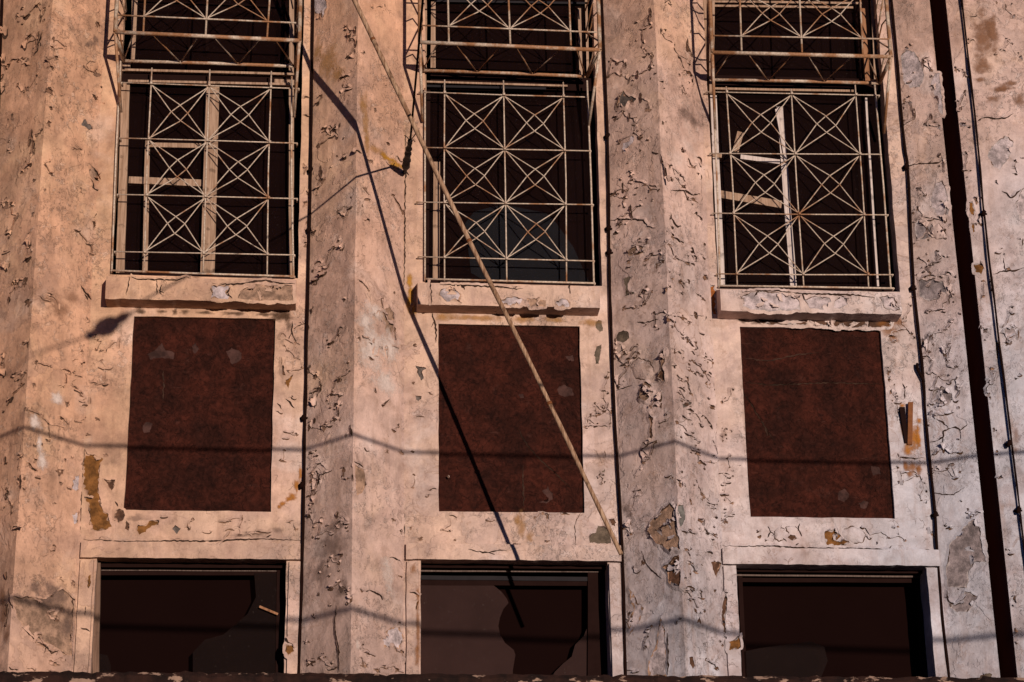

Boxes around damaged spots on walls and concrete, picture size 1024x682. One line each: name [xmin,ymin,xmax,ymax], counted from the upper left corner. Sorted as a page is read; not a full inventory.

peeling [667,146,703,222]
peeling [436,285,464,305]
peeling [501,293,573,310]
peeling [738,151,964,427]
spalling [0,314,272,542]
peeling [583,226,744,654]
rust [901,419,921,476]
peeling [896,438,963,504]
peeling [860,519,907,544]
peeling [926,499,989,616]
peeling [623,560,681,676]